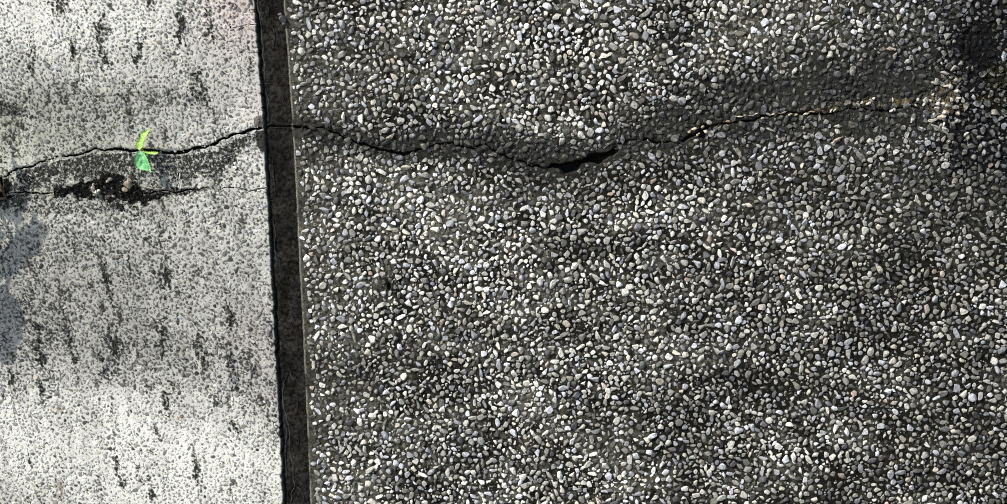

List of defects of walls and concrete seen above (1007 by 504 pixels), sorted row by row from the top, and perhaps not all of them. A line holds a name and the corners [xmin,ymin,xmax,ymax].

crack [2,123,546,197]
crack [613,137,678,150]
crack [712,105,919,127]
spalling [0,0,304,504]